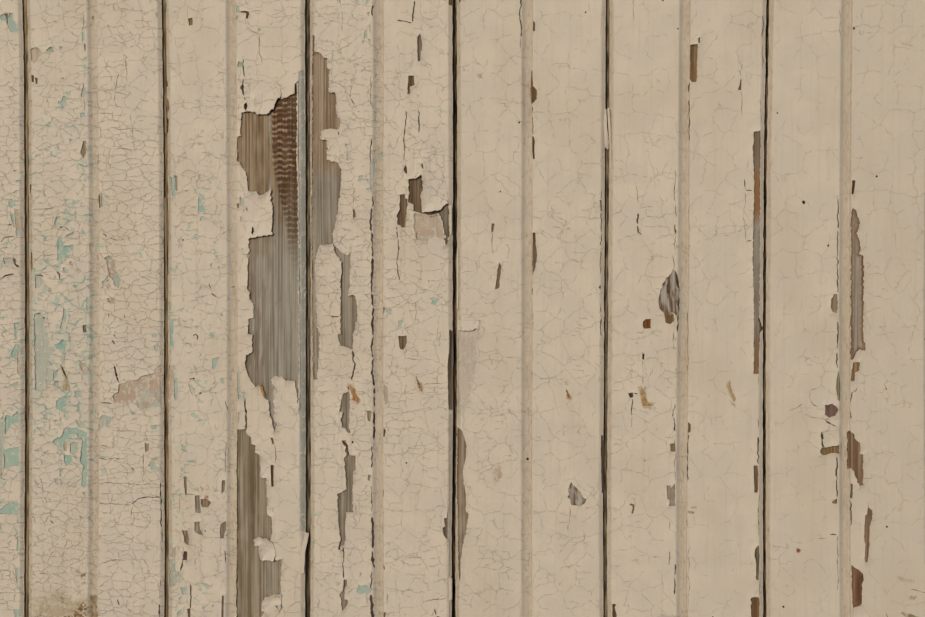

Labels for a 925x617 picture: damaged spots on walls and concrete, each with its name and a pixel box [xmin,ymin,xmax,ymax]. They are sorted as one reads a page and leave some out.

crack [239,60,247,112]
crack [99,430,163,552]
peeling [222,0,358,617]
crack [368,197,376,617]
peeling [396,111,452,279]
peeling [443,320,480,617]
crack [596,191,604,334]
crack [672,405,689,478]
peeling [743,131,763,381]
peeling [792,209,873,526]
crack [834,202,842,292]
peeling [851,506,873,617]